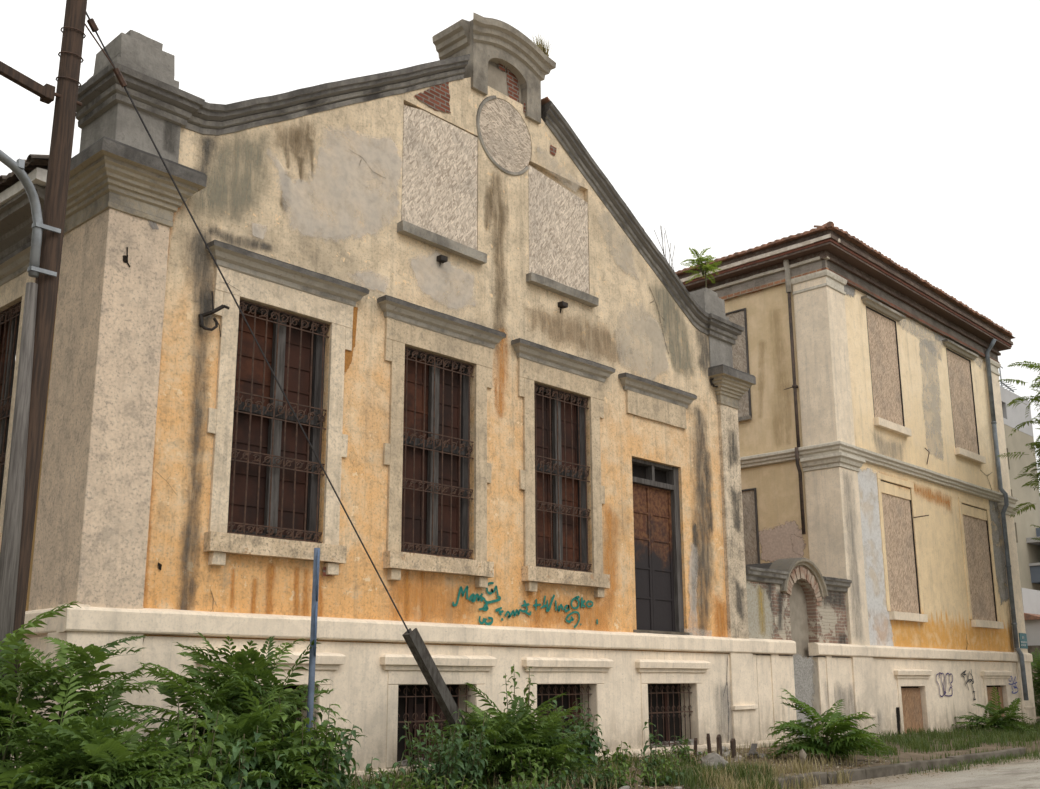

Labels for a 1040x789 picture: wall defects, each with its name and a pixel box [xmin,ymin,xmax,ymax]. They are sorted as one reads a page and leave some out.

spalling [415,82,451,113]
water stain [280,126,313,182]
water stain [191,229,270,334]
water stain [486,177,504,332]
water stain [180,355,205,610]
water stain [692,411,713,636]
corrosion [252,565,274,614]
corrosion [295,569,322,617]
peeling [746,582,775,639]